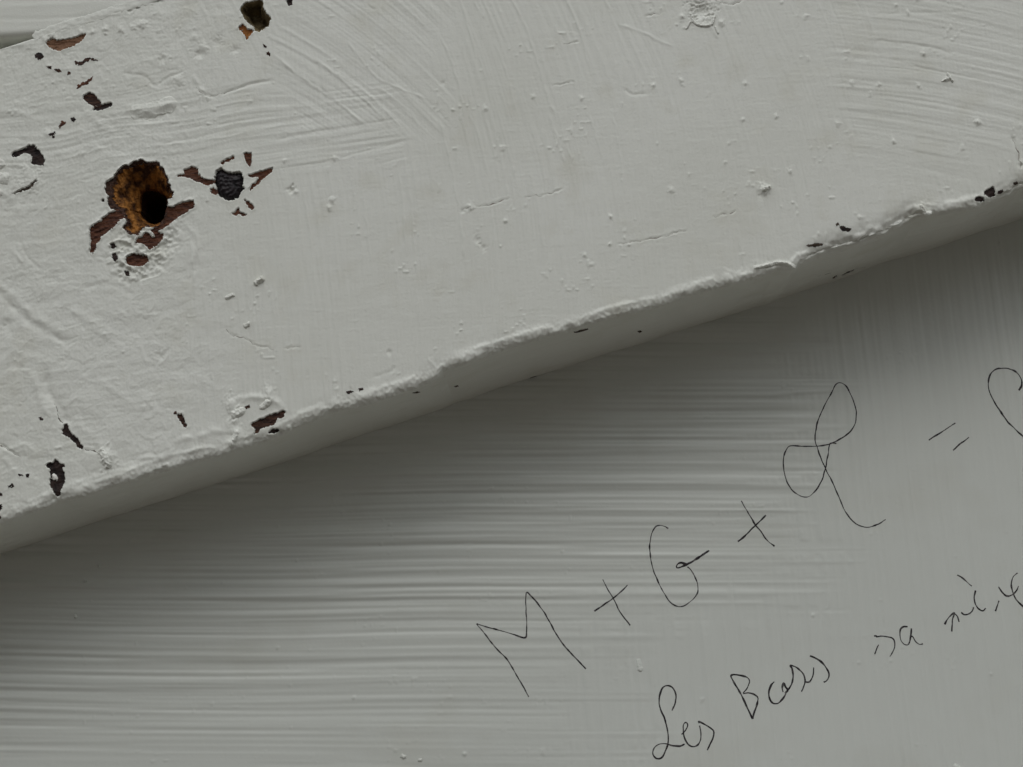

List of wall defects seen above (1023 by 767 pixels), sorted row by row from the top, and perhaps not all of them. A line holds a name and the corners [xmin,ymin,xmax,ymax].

peeling [35,34,98,75]
peeling [77,76,112,111]
peeling [12,145,45,166]
peeling [177,167,218,195]
peeling [221,152,273,216]
peeling [110,231,164,276]
peeling [251,411,285,434]
peeling [46,459,66,497]